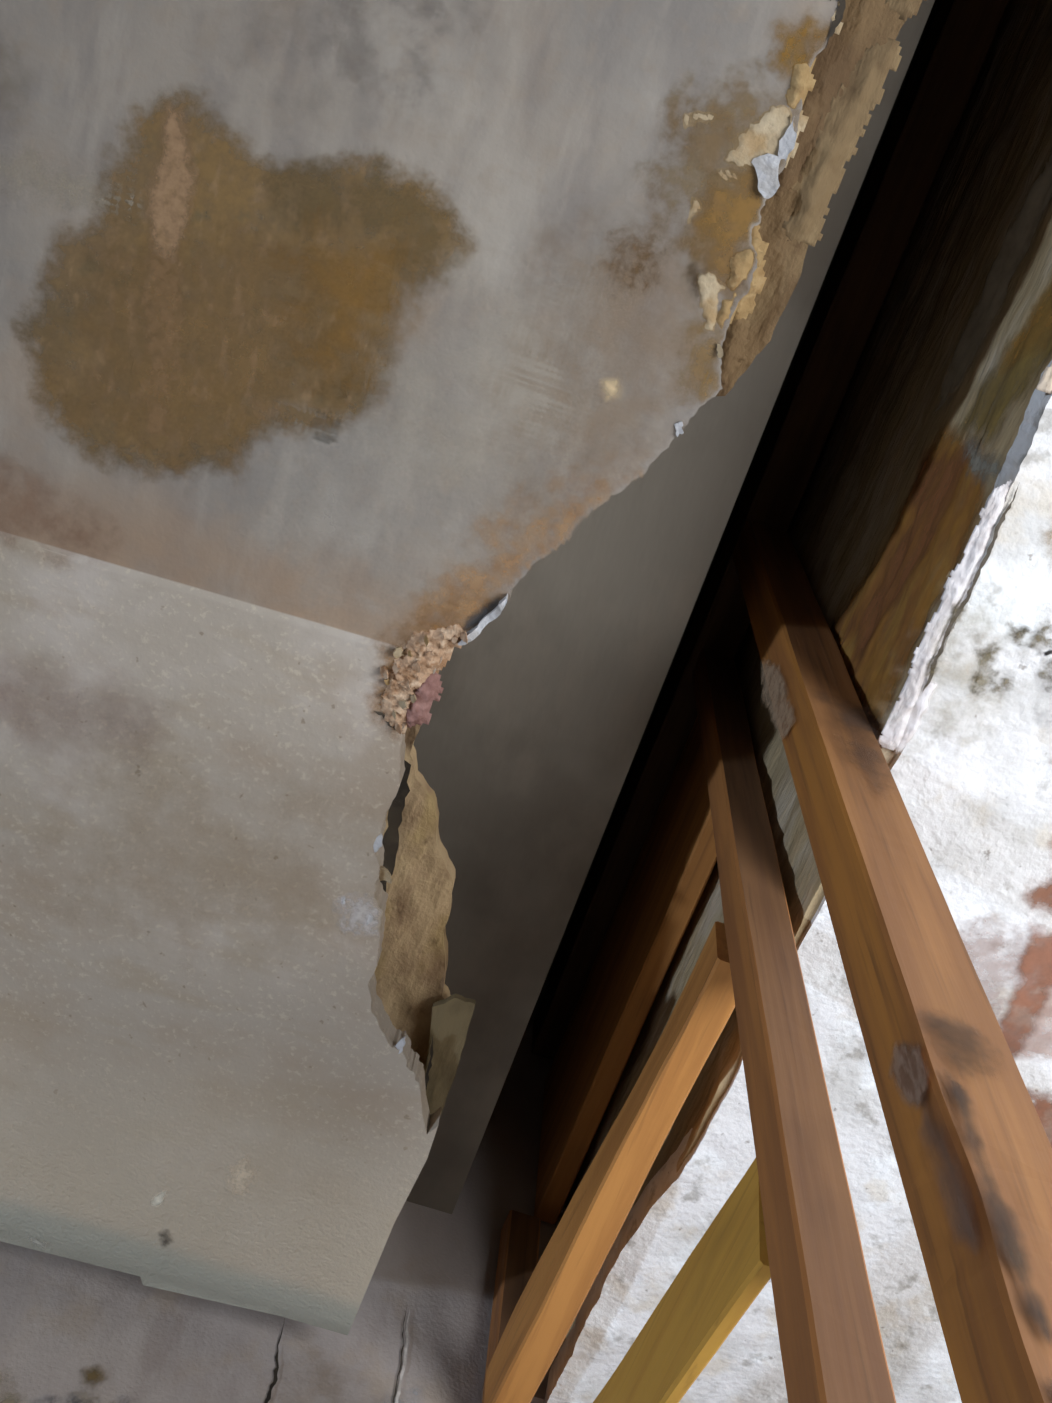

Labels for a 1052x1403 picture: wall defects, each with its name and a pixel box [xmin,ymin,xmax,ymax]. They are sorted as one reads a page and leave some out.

leakage [22,94,470,471]
spalling [661,0,926,399]
leakage [940,155,1052,404]
leakage [830,285,1052,723]
peeling [341,594,508,1120]
crack [264,1320,285,1403]
crack [393,1305,417,1403]